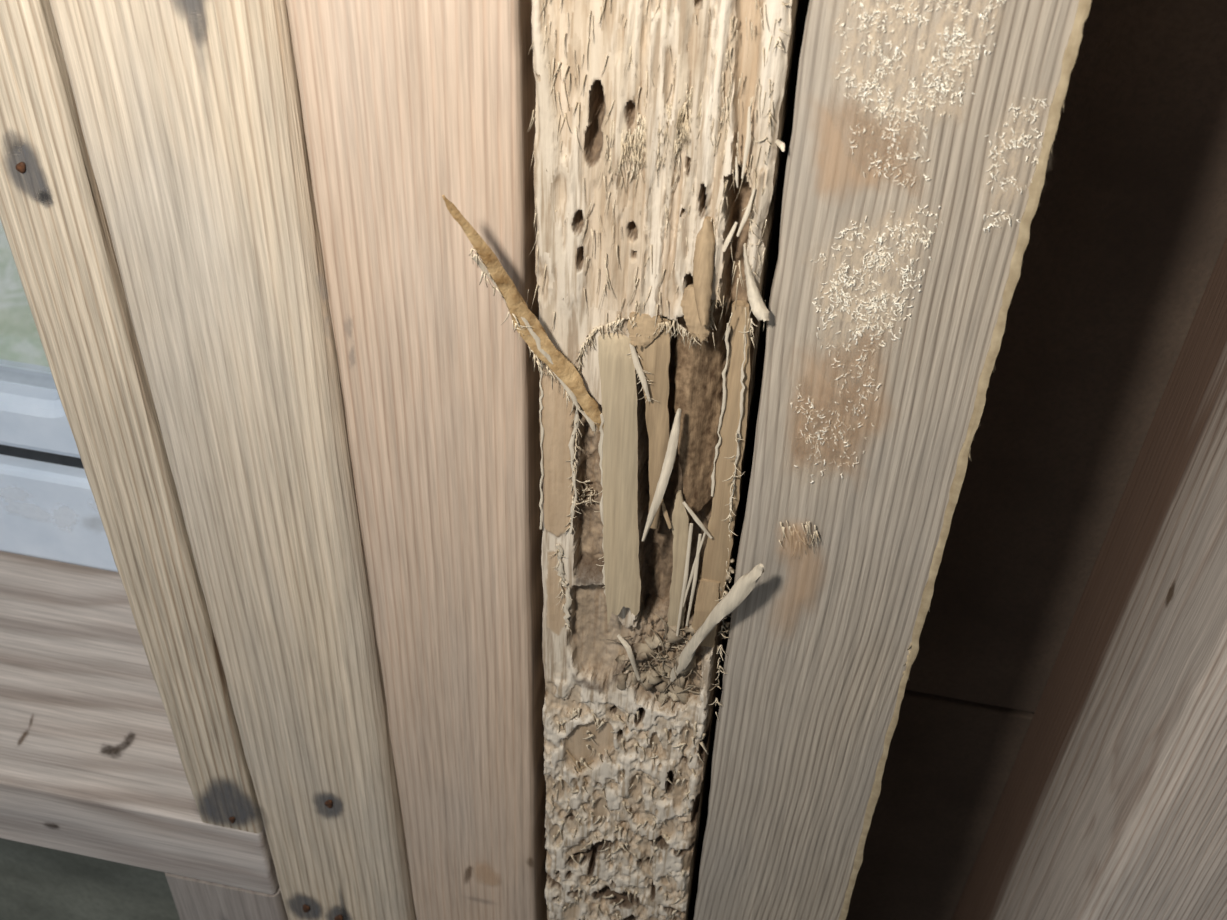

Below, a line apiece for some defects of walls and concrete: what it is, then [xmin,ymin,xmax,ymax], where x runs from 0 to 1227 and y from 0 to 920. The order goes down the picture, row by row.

peeling [743,243,770,321]
spalling [627,216,732,625]
spalling [685,719,711,763]
spalling [692,781,703,825]
hole [548,839,656,920]